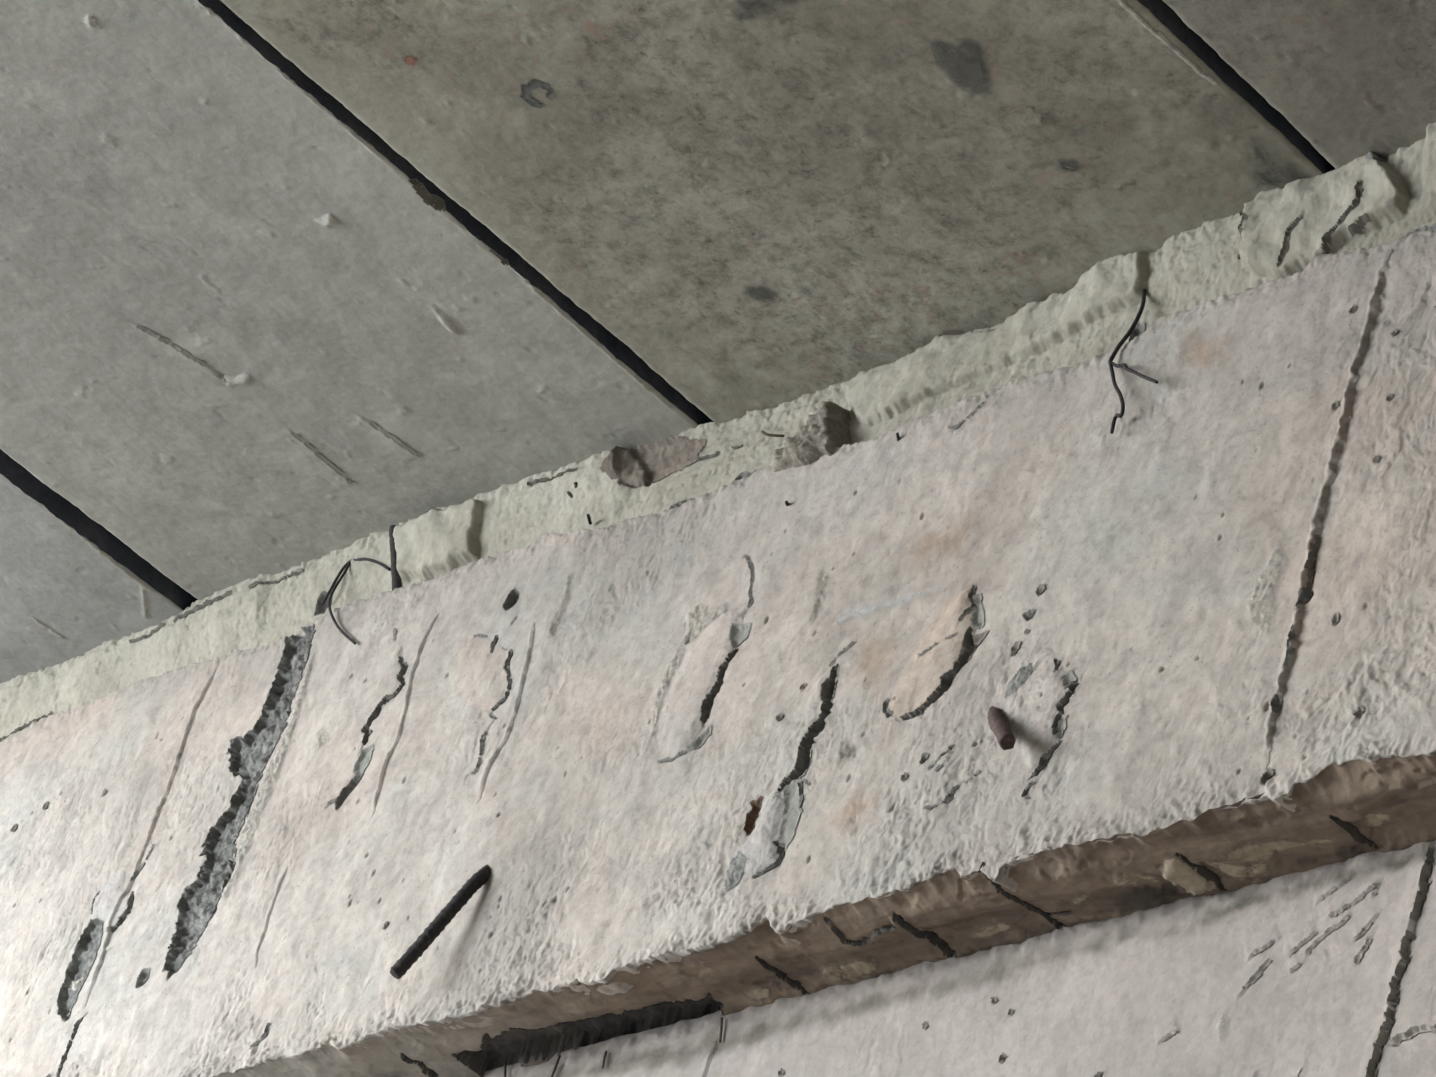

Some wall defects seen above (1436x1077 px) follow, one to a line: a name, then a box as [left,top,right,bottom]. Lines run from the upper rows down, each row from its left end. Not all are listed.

spalling [162,624,316,980]
crack [324,628,408,811]
crack [471,633,513,774]
crack [657,554,754,763]
crack [777,641,855,813]
crack [882,585,988,720]
crack [1021,670,1078,799]
spalling [57,918,103,1021]
crack [1364,847,1436,1077]